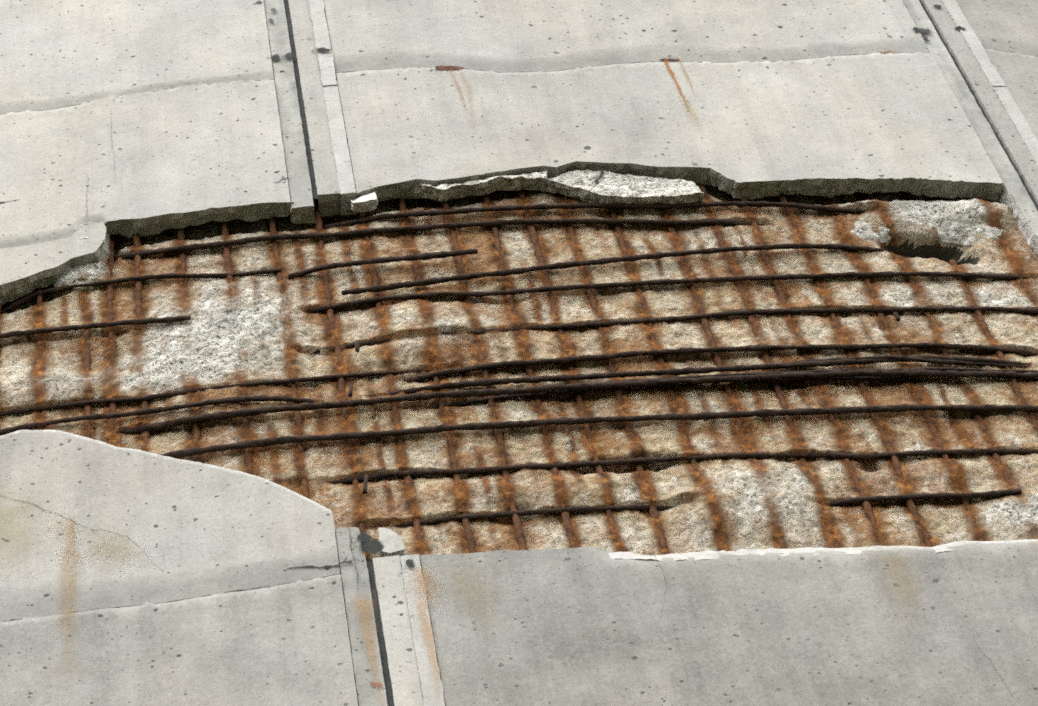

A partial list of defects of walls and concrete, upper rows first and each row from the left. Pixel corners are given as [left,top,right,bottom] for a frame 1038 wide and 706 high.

corrosion [660,58,689,107]
corrosion [0,286,49,430]
corrosion [79,227,189,452]
corrosion [183,380,203,463]
corrosion [219,221,239,298]
corrosion [237,316,325,500]
corrosion [266,212,429,559]
spalling [0,170,1038,561]
corrosion [395,190,1038,555]